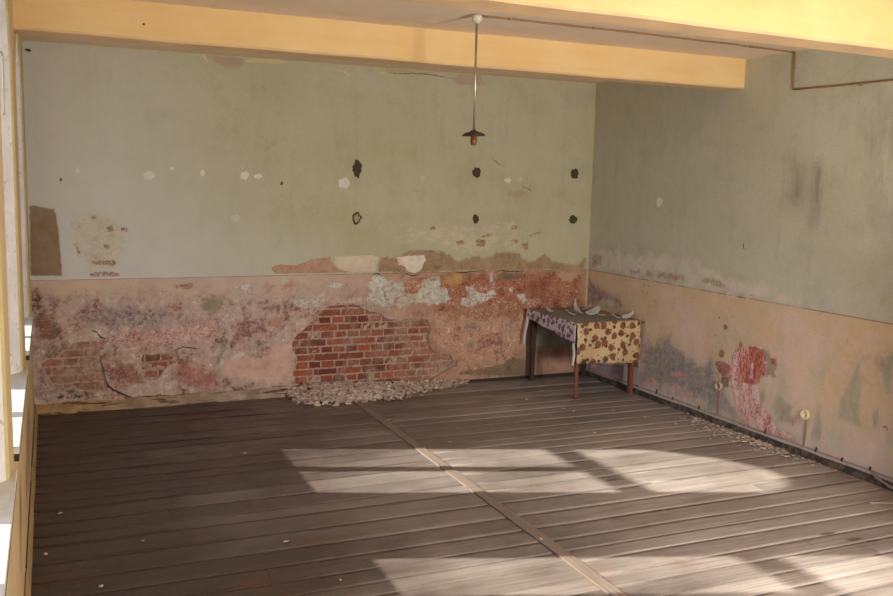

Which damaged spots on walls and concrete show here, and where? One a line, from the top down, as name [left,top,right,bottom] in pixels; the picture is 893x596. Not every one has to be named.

spalling [352,159,362,178]
flaking render [262,248,588,295]
crack [102,363,132,398]
flaking render [141,352,179,382]
flaking render [292,304,458,387]
leakage [637,331,746,427]
flaking render [715,341,801,443]